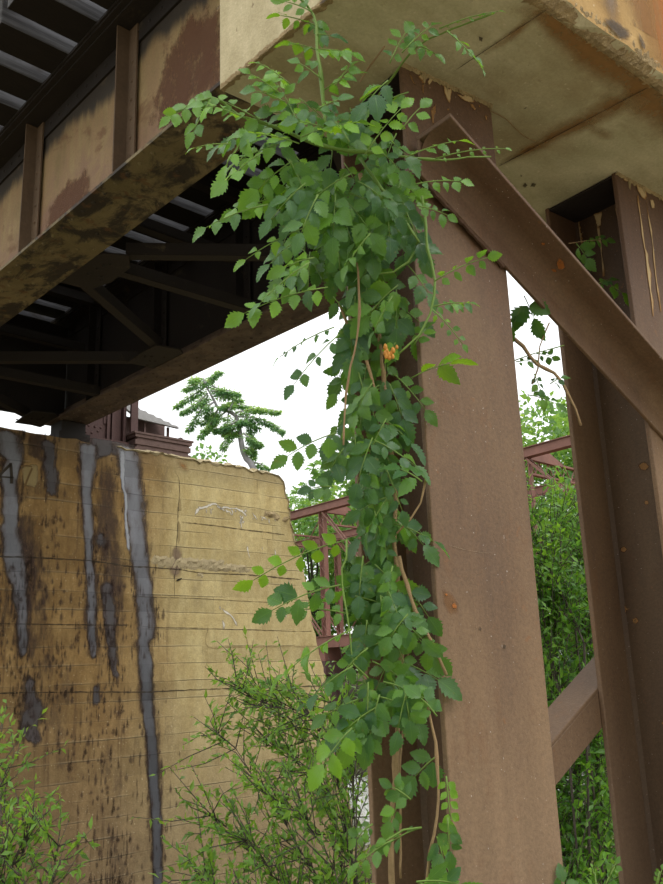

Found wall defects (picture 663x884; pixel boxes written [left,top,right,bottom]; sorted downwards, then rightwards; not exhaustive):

rust [512,11,663,159]
spalling [521,0,663,95]
water stain [606,0,645,49]
rust [46,170,89,229]